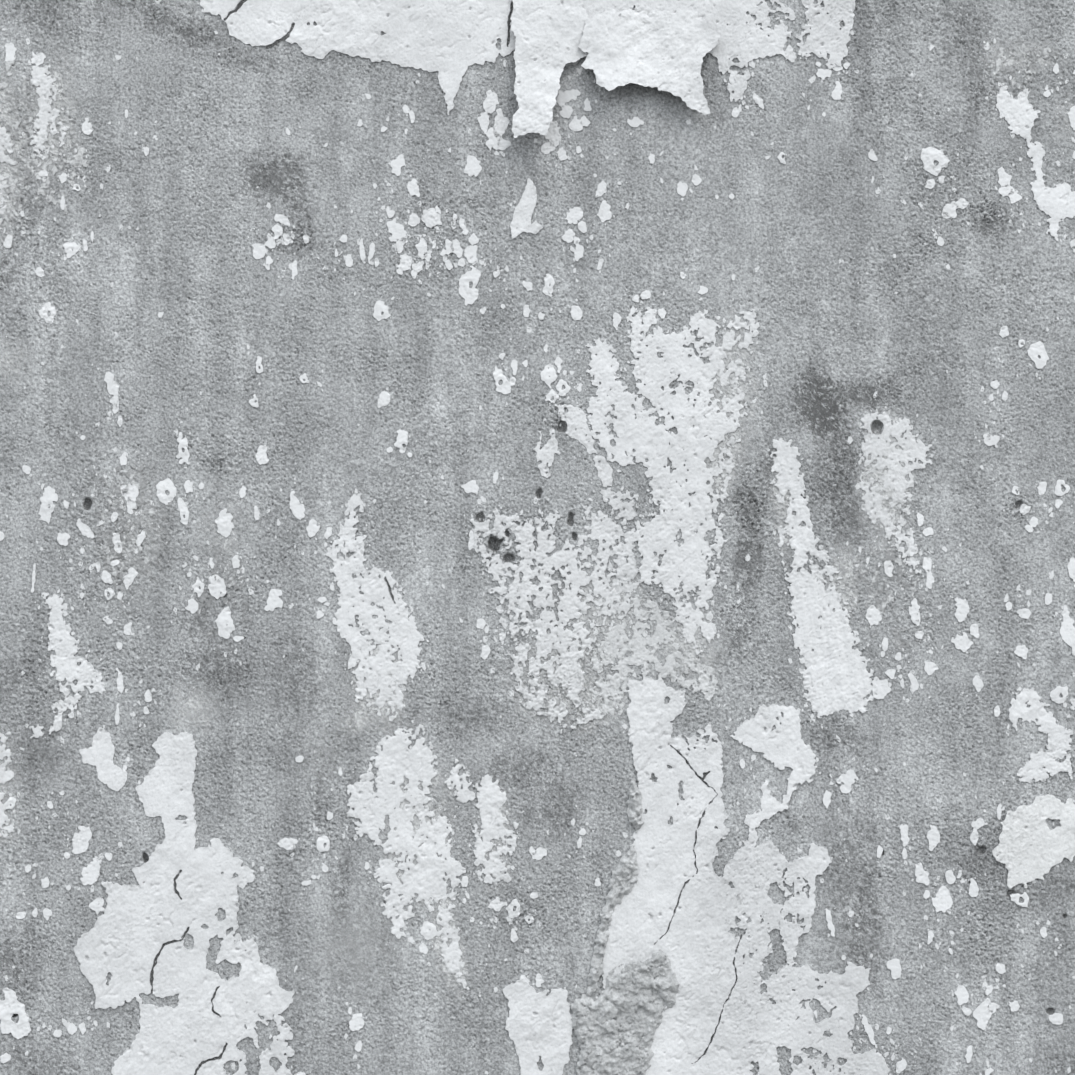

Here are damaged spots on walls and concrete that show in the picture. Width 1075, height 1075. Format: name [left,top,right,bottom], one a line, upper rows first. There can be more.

peeling [0,43,94,253]
peeling [200,0,855,161]
peeling [987,34,1075,253]
peeling [30,555,306,1075]
peeling [289,491,534,990]
crack [668,745,711,929]
peeling [468,290,940,1075]
peeling [899,824,956,913]
peeling [951,598,979,652]
peeling [969,686,1075,907]
peeling [0,988,31,1039]
crack [194,1043,227,1075]